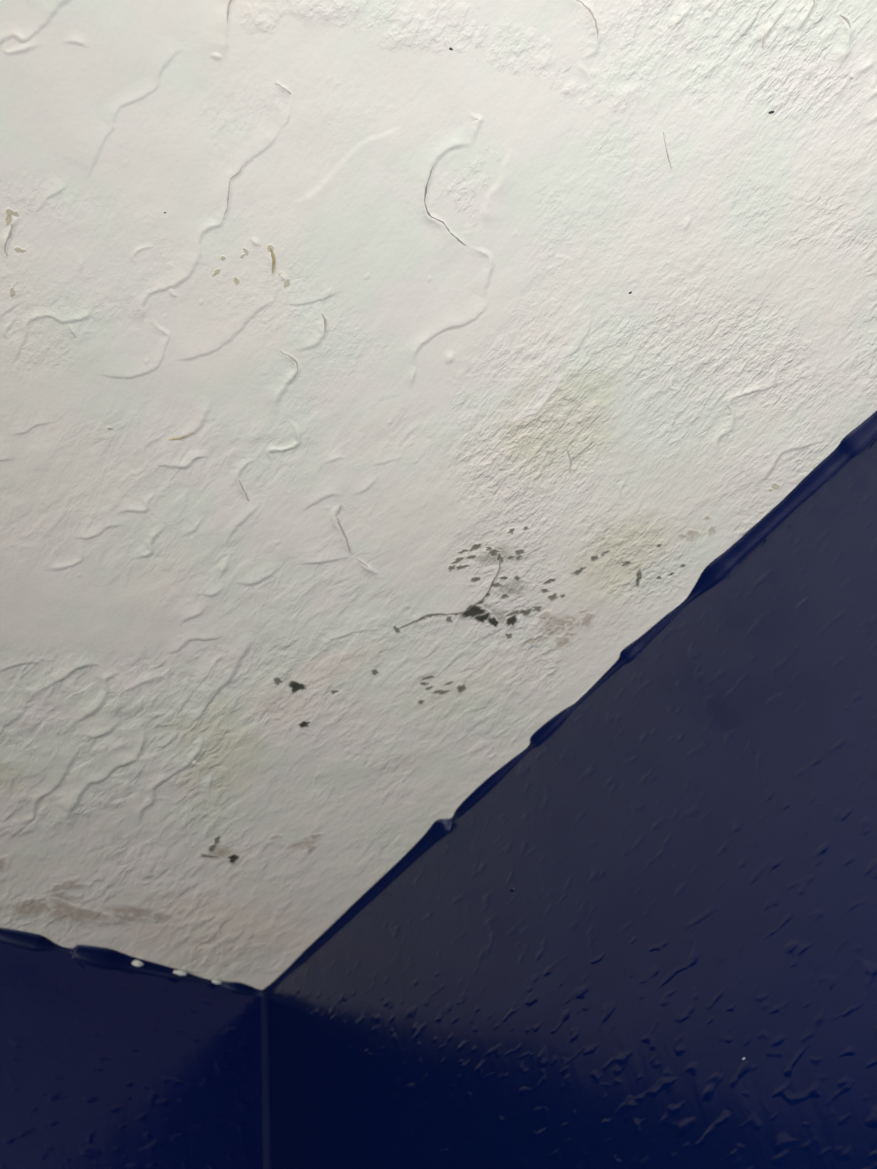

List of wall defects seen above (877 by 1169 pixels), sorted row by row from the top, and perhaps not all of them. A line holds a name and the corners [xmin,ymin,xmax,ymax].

leakage [365,334,720,744]
leakage [0,667,345,973]